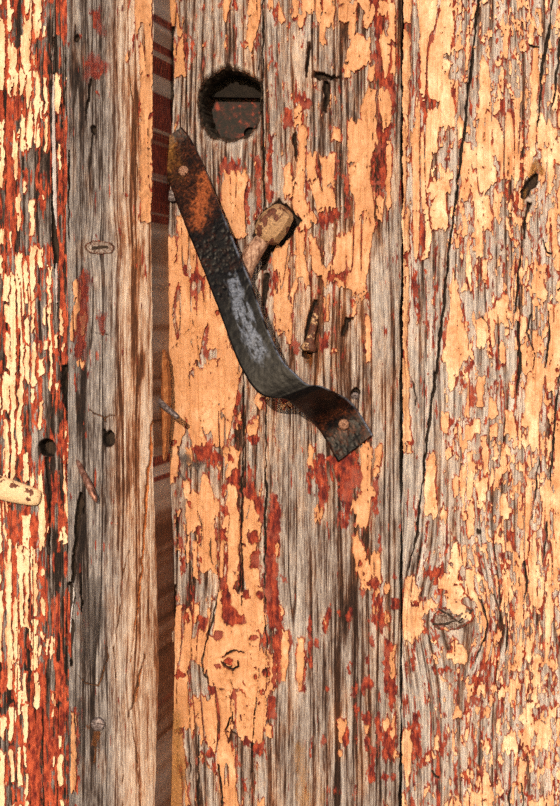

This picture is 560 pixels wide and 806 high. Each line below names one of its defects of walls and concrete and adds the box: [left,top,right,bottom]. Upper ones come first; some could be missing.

peeling [170,0,186,78]
peeling [212,0,232,22]
peeling [0,0,85,806]
crack [68,421,153,804]
crack [174,514,202,580]
crack [189,735,224,806]
crack [202,371,245,689]
peeling [168,214,305,806]
peeling [221,162,257,239]
crack [261,406,269,603]
peeling [245,0,560,806]
crack [408,0,480,569]